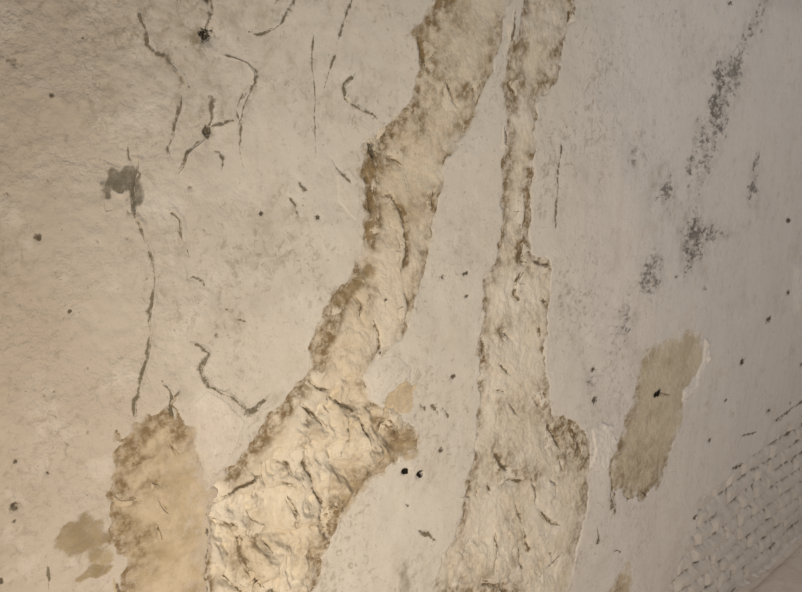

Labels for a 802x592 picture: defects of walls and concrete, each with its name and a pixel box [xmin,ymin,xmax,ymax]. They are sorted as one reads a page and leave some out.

crack [248,0,295,36]
crack [135,7,258,175]
crack [311,37,381,140]
water stain [686,51,743,175]
peeling [99,154,145,215]
crack [127,150,179,422]
crack [166,207,205,286]
spalling [106,0,711,592]
water stain [683,218,722,273]
crack [190,340,266,415]
water stain [57,514,112,582]
flaking render [665,415,802,592]